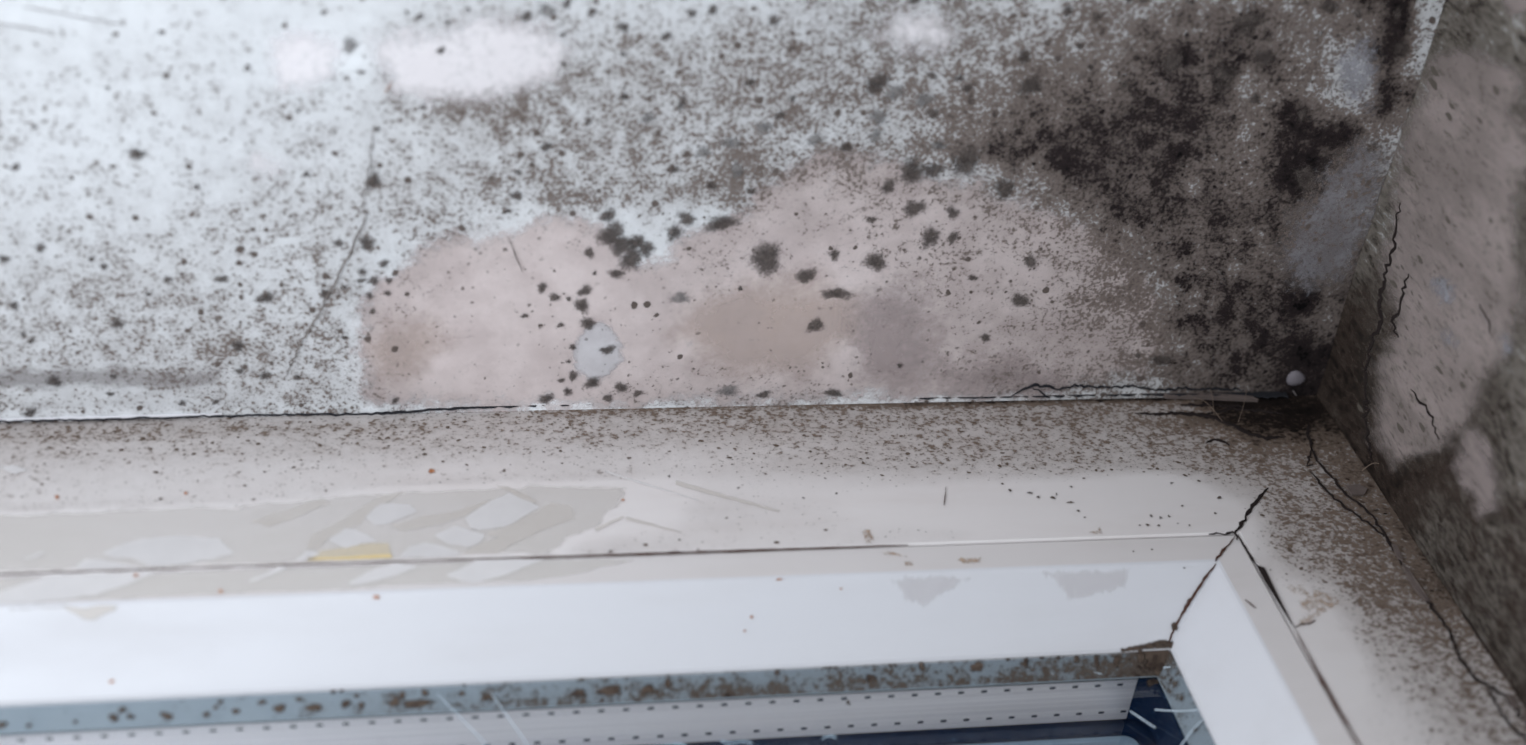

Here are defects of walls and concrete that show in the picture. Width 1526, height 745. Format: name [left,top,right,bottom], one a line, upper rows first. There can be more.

water stain [146,12,229,114]
water stain [344,30,364,53]
water stain [428,0,470,54]
water stain [0,57,88,170]
crack [0,137,569,424]
water stain [537,272,596,330]
water stain [741,233,792,274]
water stain [797,269,817,283]
water stain [808,319,822,331]
water stain [823,289,850,299]
water stain [558,339,598,396]
crack [913,203,1526,741]